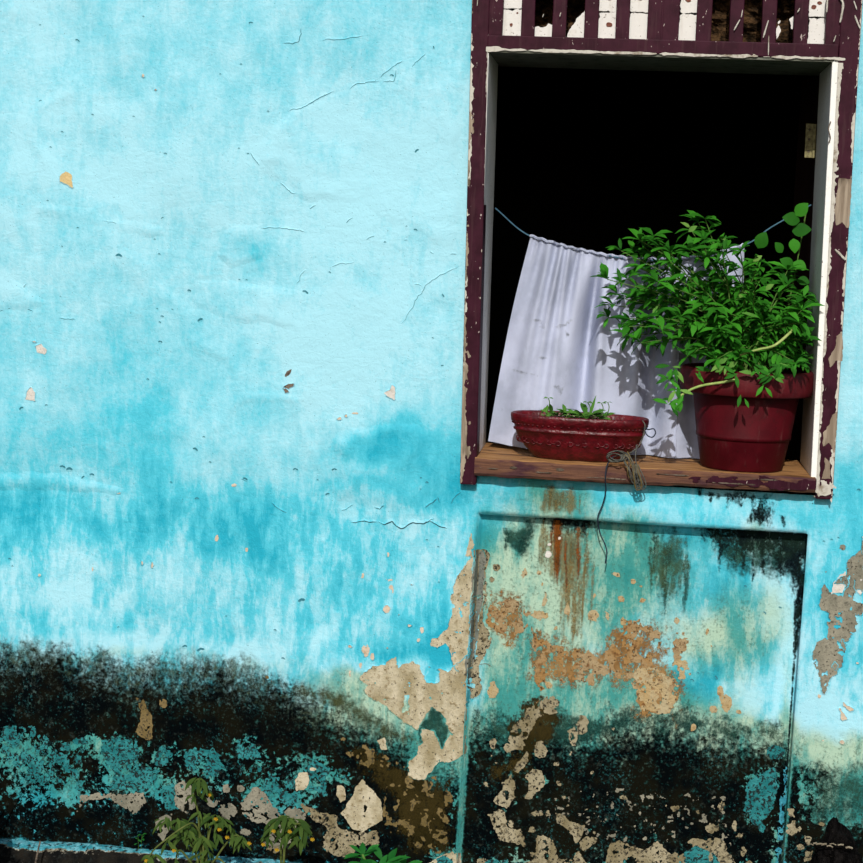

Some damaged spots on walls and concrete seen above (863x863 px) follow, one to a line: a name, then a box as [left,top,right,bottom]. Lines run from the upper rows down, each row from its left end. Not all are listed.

peeling [59,171,74,189]
crack [341,491,461,529]
peeling [0,698,224,841]
water stain [0,488,863,863]
peeling [207,533,752,863]
corrosion [490,590,525,646]
corrosion [525,486,687,701]
peeling [743,745,813,863]
peeling [812,536,863,698]
peeling [838,701,856,722]